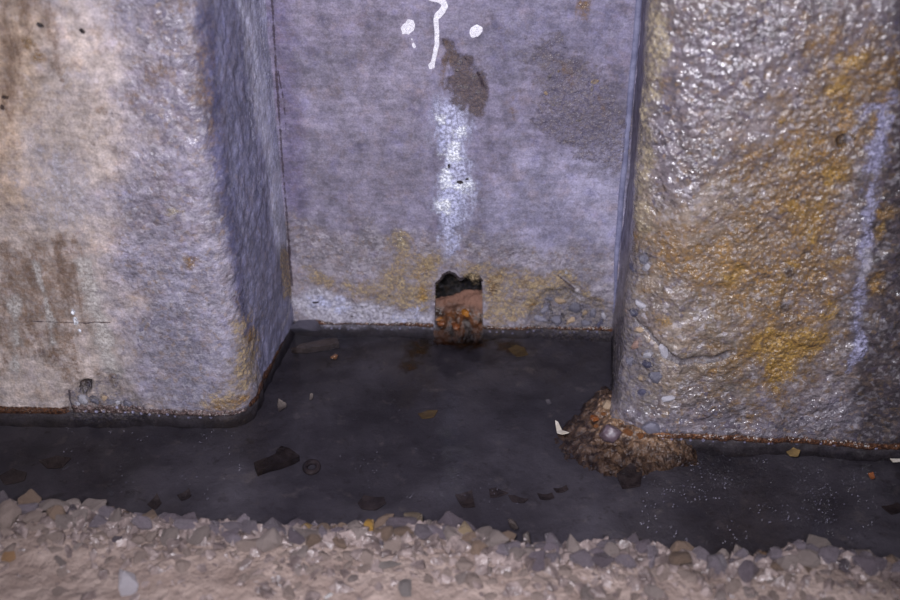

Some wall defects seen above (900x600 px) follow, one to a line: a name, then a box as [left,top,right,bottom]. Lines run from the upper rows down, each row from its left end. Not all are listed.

damp [280,101,475,329]
rust [633,46,899,407]
rust [554,386,900,477]